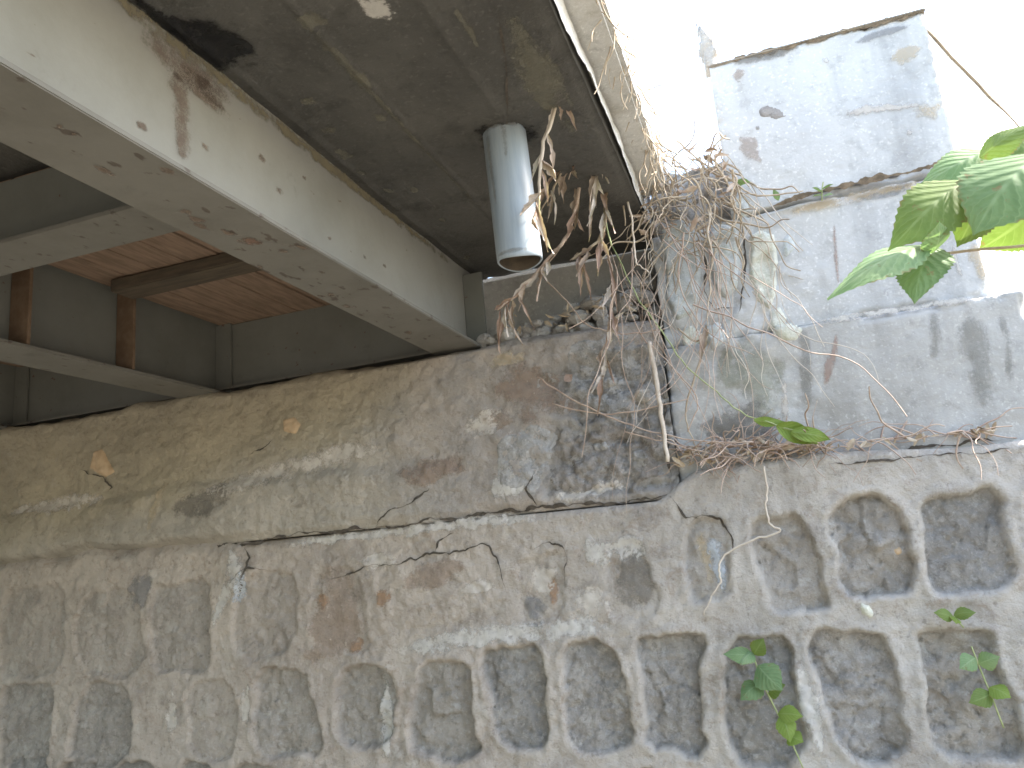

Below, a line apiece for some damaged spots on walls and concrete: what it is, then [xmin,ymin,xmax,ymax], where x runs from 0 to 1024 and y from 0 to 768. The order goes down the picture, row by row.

leakage [128,0,255,71]
corrosion [154,40,221,157]
spalling [90,449,114,477]
crack [217,381,734,596]
crack [832,438,1007,465]